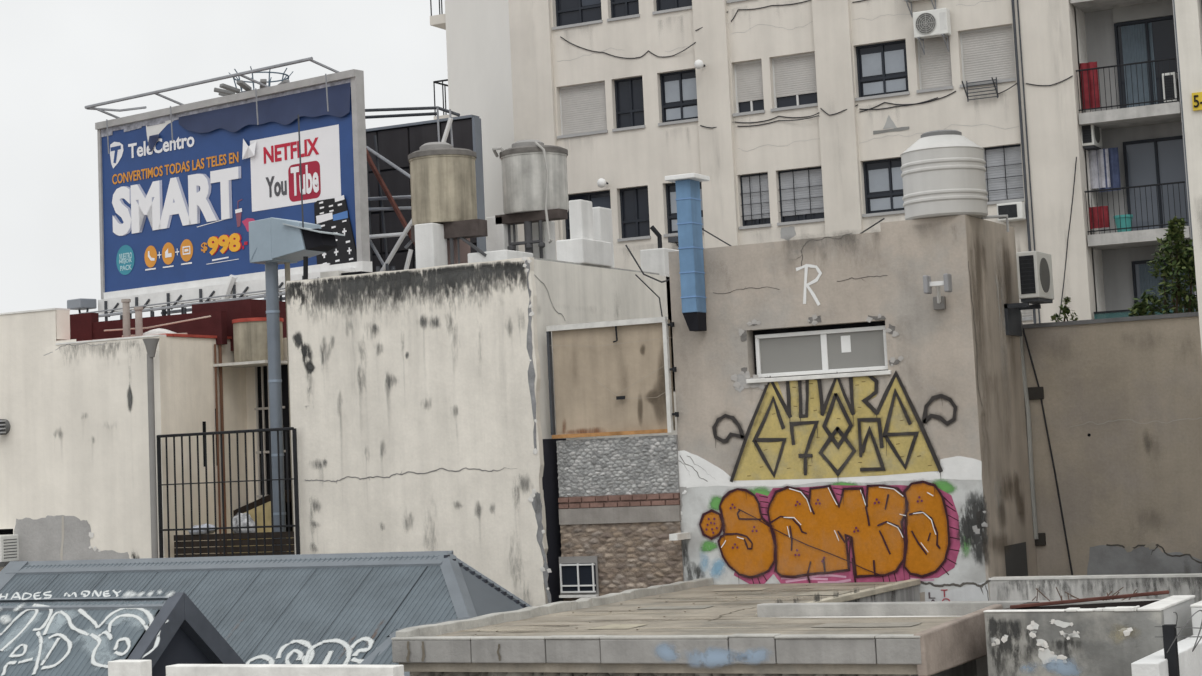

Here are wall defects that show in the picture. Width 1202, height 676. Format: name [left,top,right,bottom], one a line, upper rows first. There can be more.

damp [286,262,526,302]
damp [293,333,314,374]
crack [305,467,517,484]
flaking render [14,515,130,561]
spalling [1087,542,1202,575]